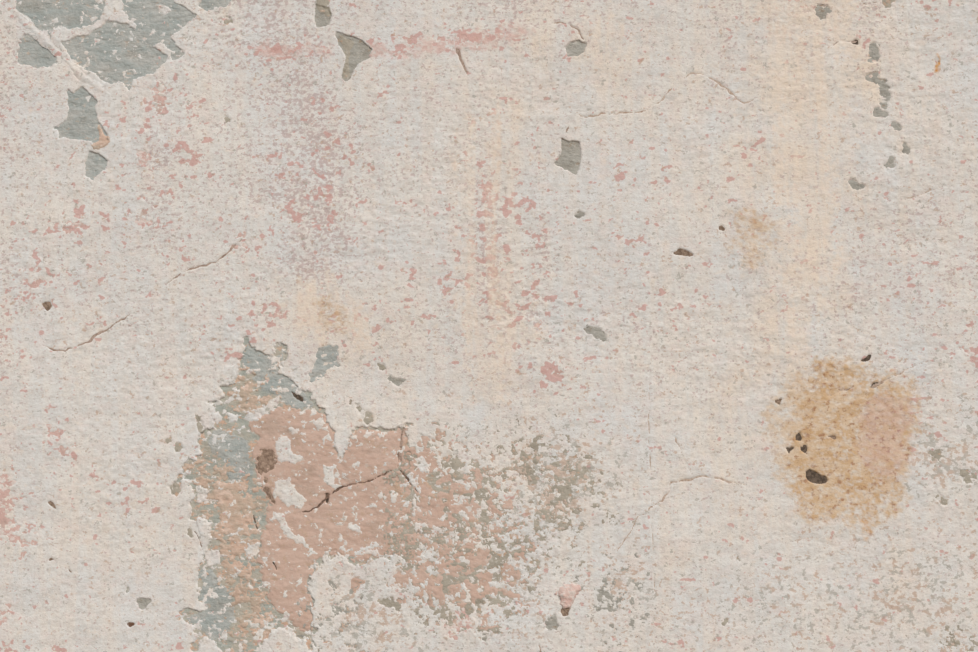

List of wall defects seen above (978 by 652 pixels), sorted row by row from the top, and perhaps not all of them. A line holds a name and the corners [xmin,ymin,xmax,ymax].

peeling [16,0,233,114]
peeling [315,0,372,82]
peeling [54,87,110,180]
peeling [555,127,581,175]
crack [165,240,241,285]
crack [47,314,130,352]
peeling [583,324,606,342]
crack [303,427,418,512]
peeling [170,337,666,652]
crack [617,437,745,551]